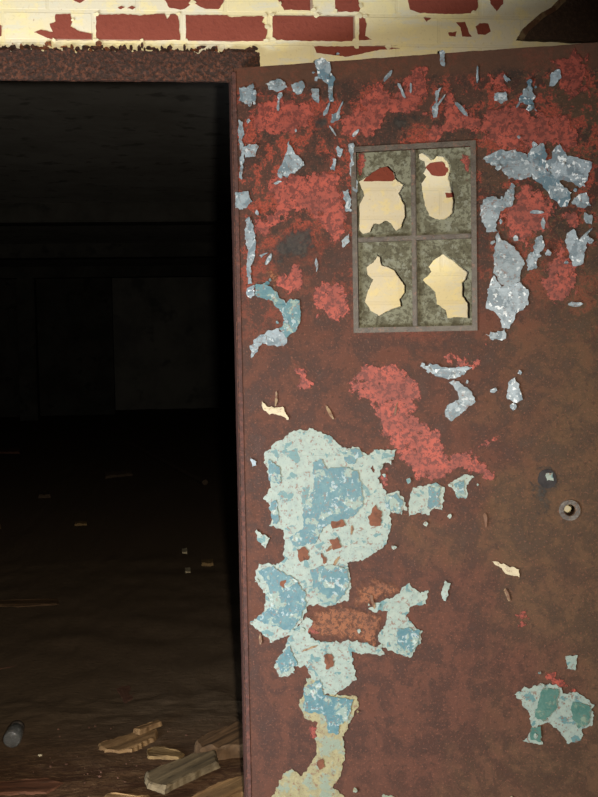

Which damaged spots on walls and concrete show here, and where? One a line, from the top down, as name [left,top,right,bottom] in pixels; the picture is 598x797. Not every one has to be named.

corrosion [0,40,230,54]
peeling [34,0,400,136]
peeling [407,0,491,37]
peeling [238,119,259,180]
peeling [274,142,304,184]
peeling [330,129,397,212]
peeling [235,191,301,358]
peeling [480,141,594,340]
peeling [421,363,476,421]
corrosion [311,579,400,646]
peeling [250,428,479,797]
peeling [515,672,594,745]